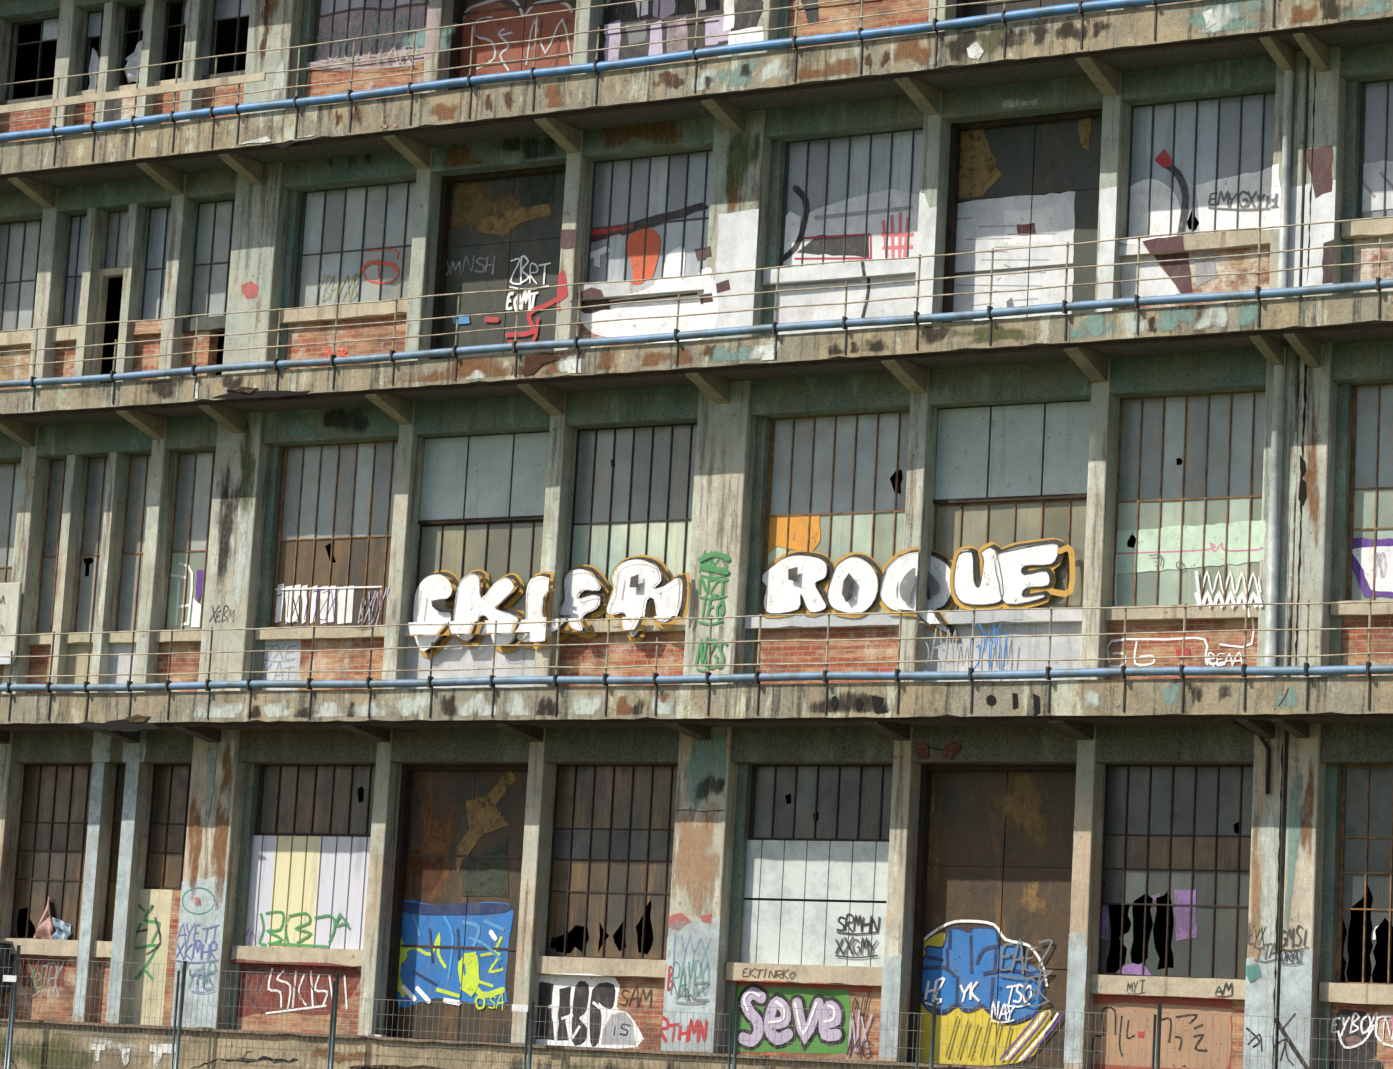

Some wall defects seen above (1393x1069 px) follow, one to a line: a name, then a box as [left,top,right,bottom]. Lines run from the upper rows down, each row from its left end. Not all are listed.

water stain [218,419,256,611]
rust [188,743,232,905]
crack [1272,742,1283,1061]
water stain [0,1033,92,1069]
crack [190,1051,298,1069]